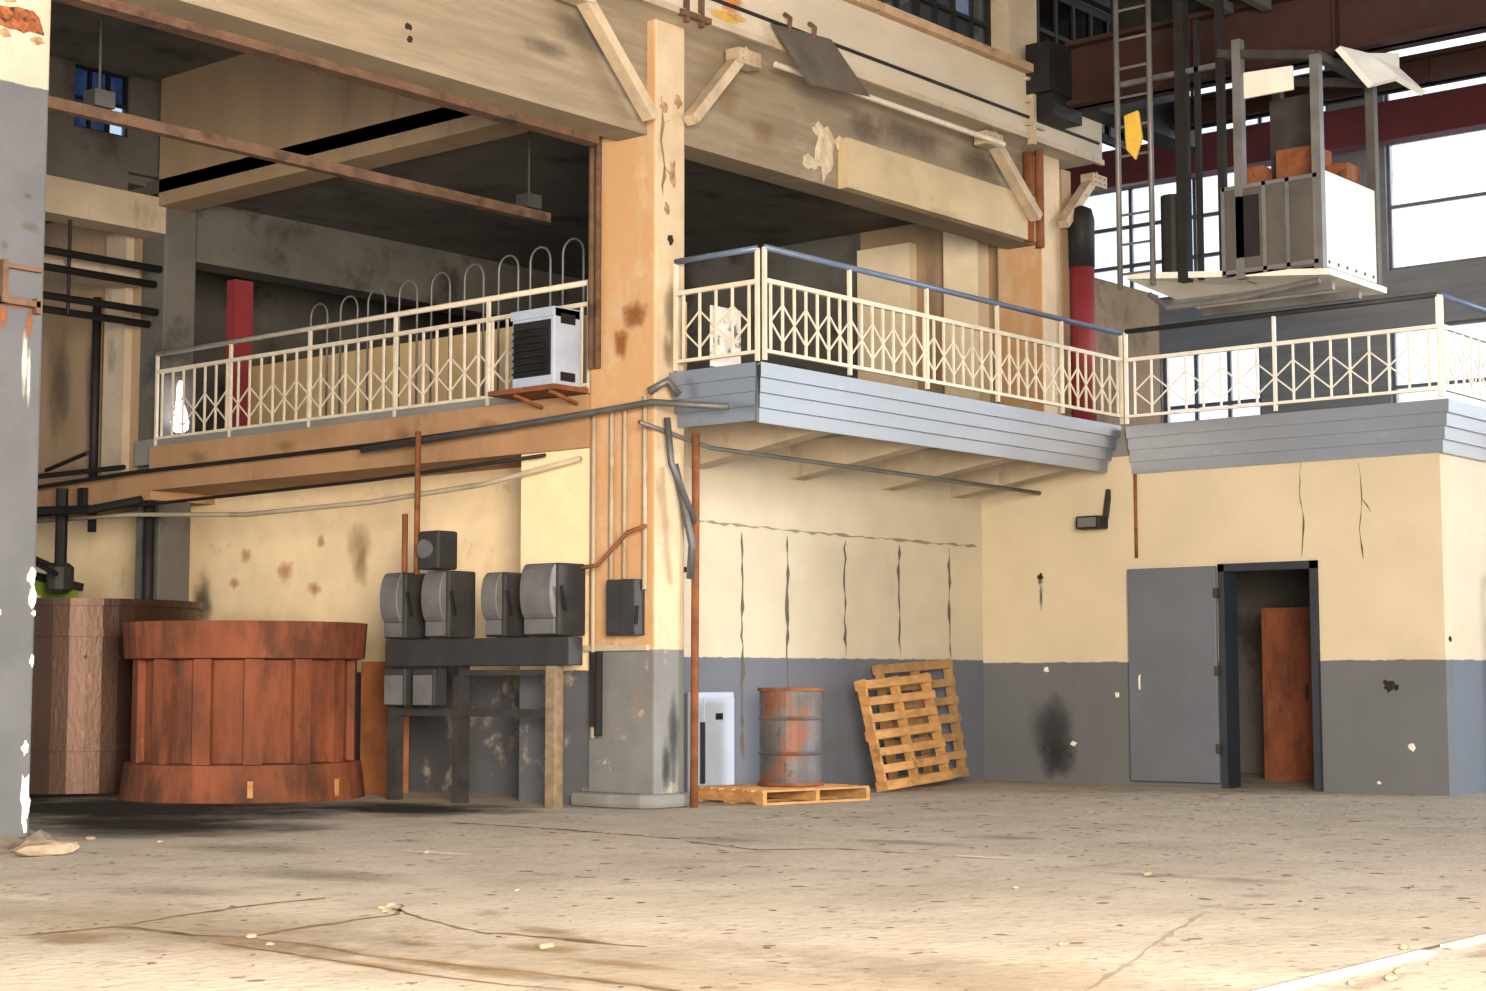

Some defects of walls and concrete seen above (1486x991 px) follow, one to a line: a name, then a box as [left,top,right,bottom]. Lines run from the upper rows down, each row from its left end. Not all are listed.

spalling [0,0,45,45]
spalling [803,121,842,183]
crack [1298,464,1306,557]
crack [1358,463,1371,559]